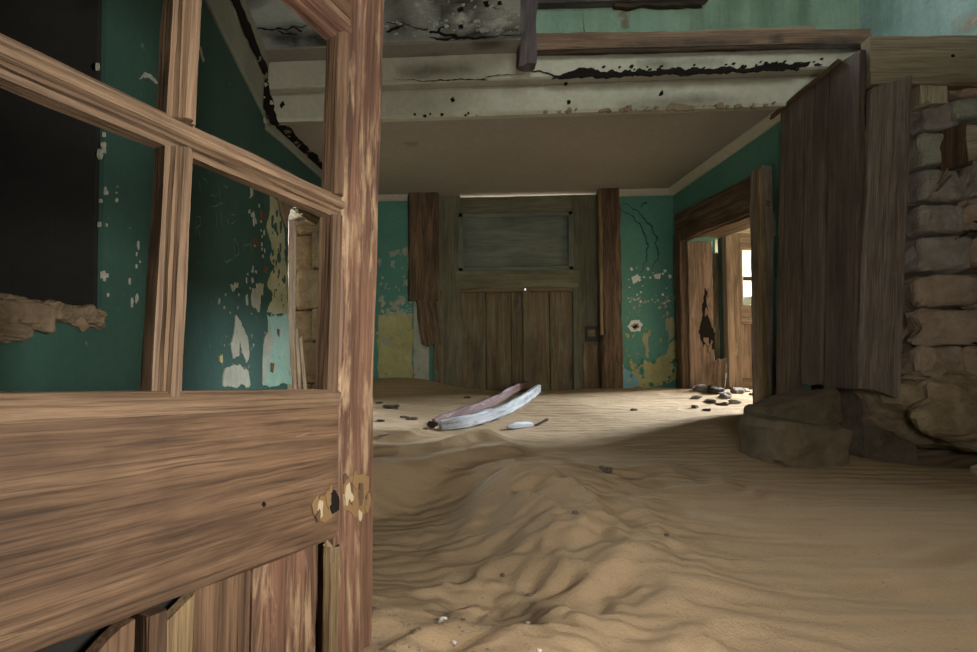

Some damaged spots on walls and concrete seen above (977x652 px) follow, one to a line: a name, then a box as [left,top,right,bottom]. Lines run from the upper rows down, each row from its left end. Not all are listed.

crack [257,25,308,36]
crack [386,5,521,41]
spalling [551,58,824,80]
peeling [218,188,303,388]
peeling [376,246,414,378]
peeling [623,267,677,388]